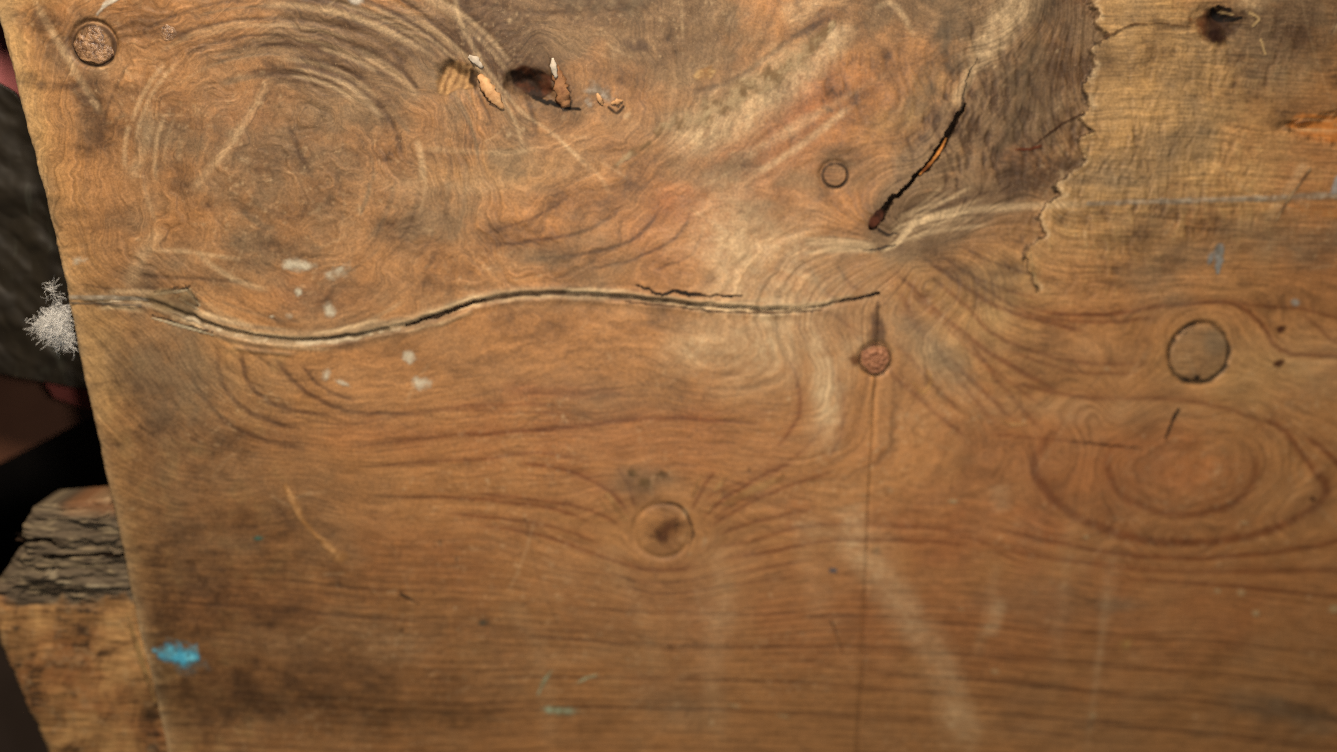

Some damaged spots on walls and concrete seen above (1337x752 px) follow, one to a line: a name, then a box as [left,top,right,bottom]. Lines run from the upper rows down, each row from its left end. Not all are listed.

crack [1104,23,1181,38]
crack [1015,112,1085,150]
spalling [1287,111,1337,143]
crack [869,62,976,250]
crack [69,284,878,345]